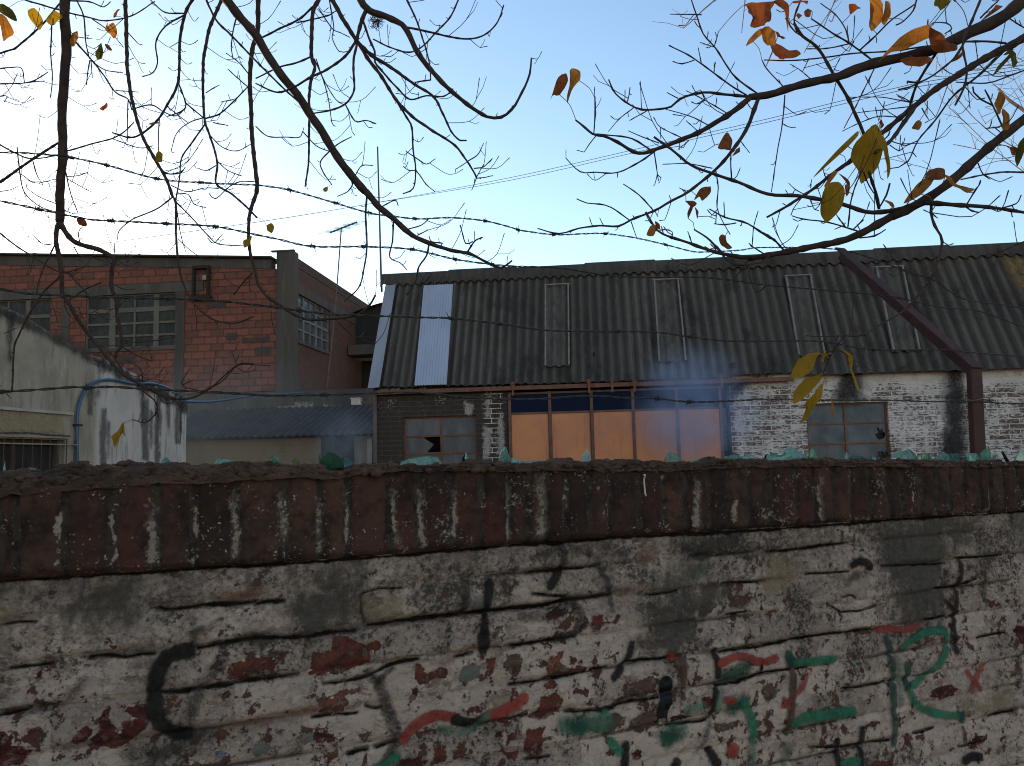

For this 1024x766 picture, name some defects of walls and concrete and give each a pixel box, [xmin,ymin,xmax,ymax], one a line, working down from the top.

leakage [0,305,188,463]
leakage [943,370,967,461]
leakage [877,517,980,631]
peeling [222,655,276,700]
peeling [306,634,382,676]
peeling [484,654,523,676]
peeling [70,703,148,748]
peeling [494,651,589,760]
peeling [0,731,32,766]